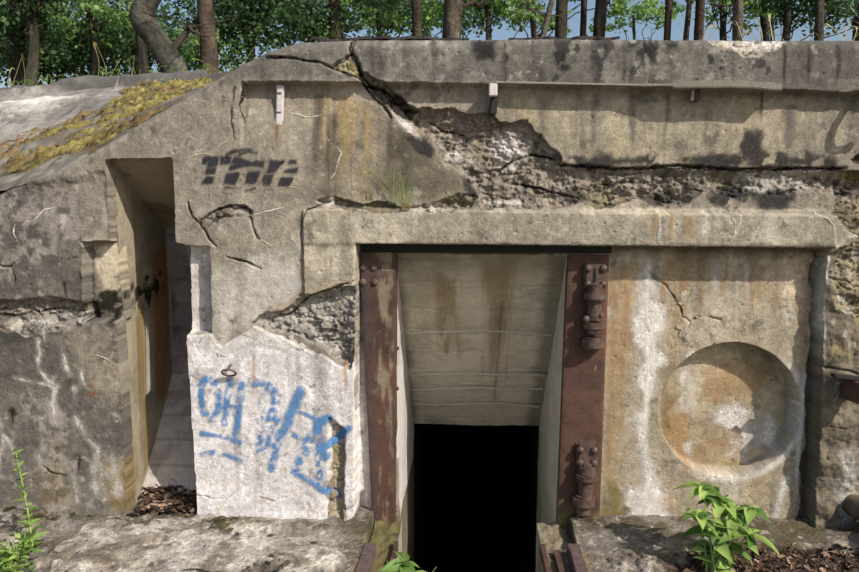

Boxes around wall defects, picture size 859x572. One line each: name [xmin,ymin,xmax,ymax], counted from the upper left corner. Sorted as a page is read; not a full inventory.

leakage [474,41,495,60]
crack [188,186,331,254]
spalling [316,56,859,326]
leakage [569,153,655,171]
leakage [709,183,795,239]
leakage [683,106,837,171]
spalling [0,298,97,337]
spalling [215,276,361,370]
flaking render [677,290,699,347]
leakage [30,318,58,424]
leakage [625,260,668,516]
leakage [75,416,123,501]